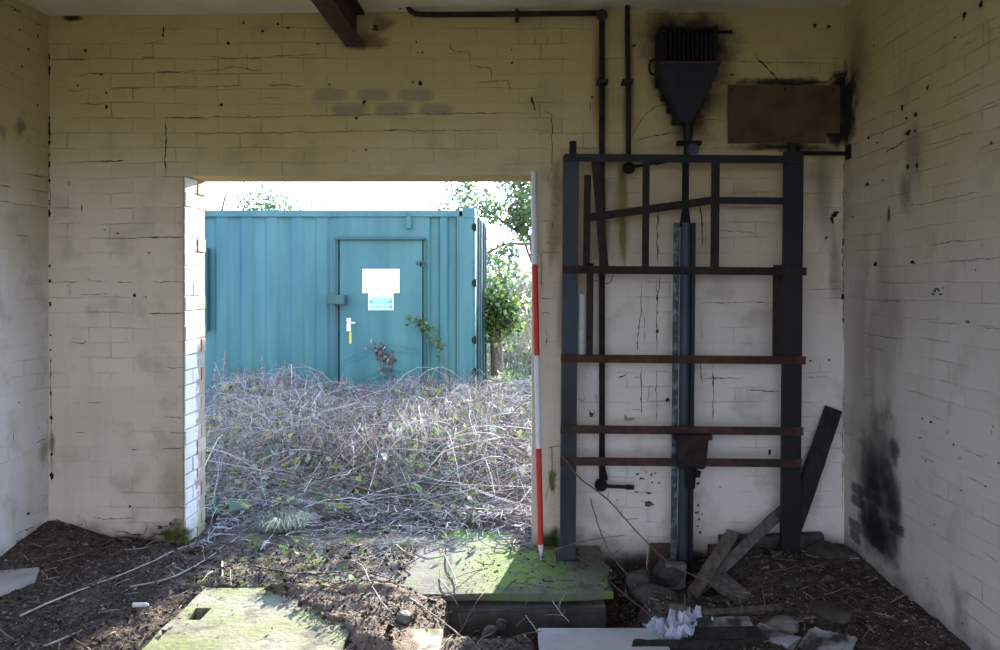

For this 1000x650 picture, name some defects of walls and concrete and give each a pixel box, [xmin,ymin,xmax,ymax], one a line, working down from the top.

crack [143,26,560,180]
crack [616,212,660,419]